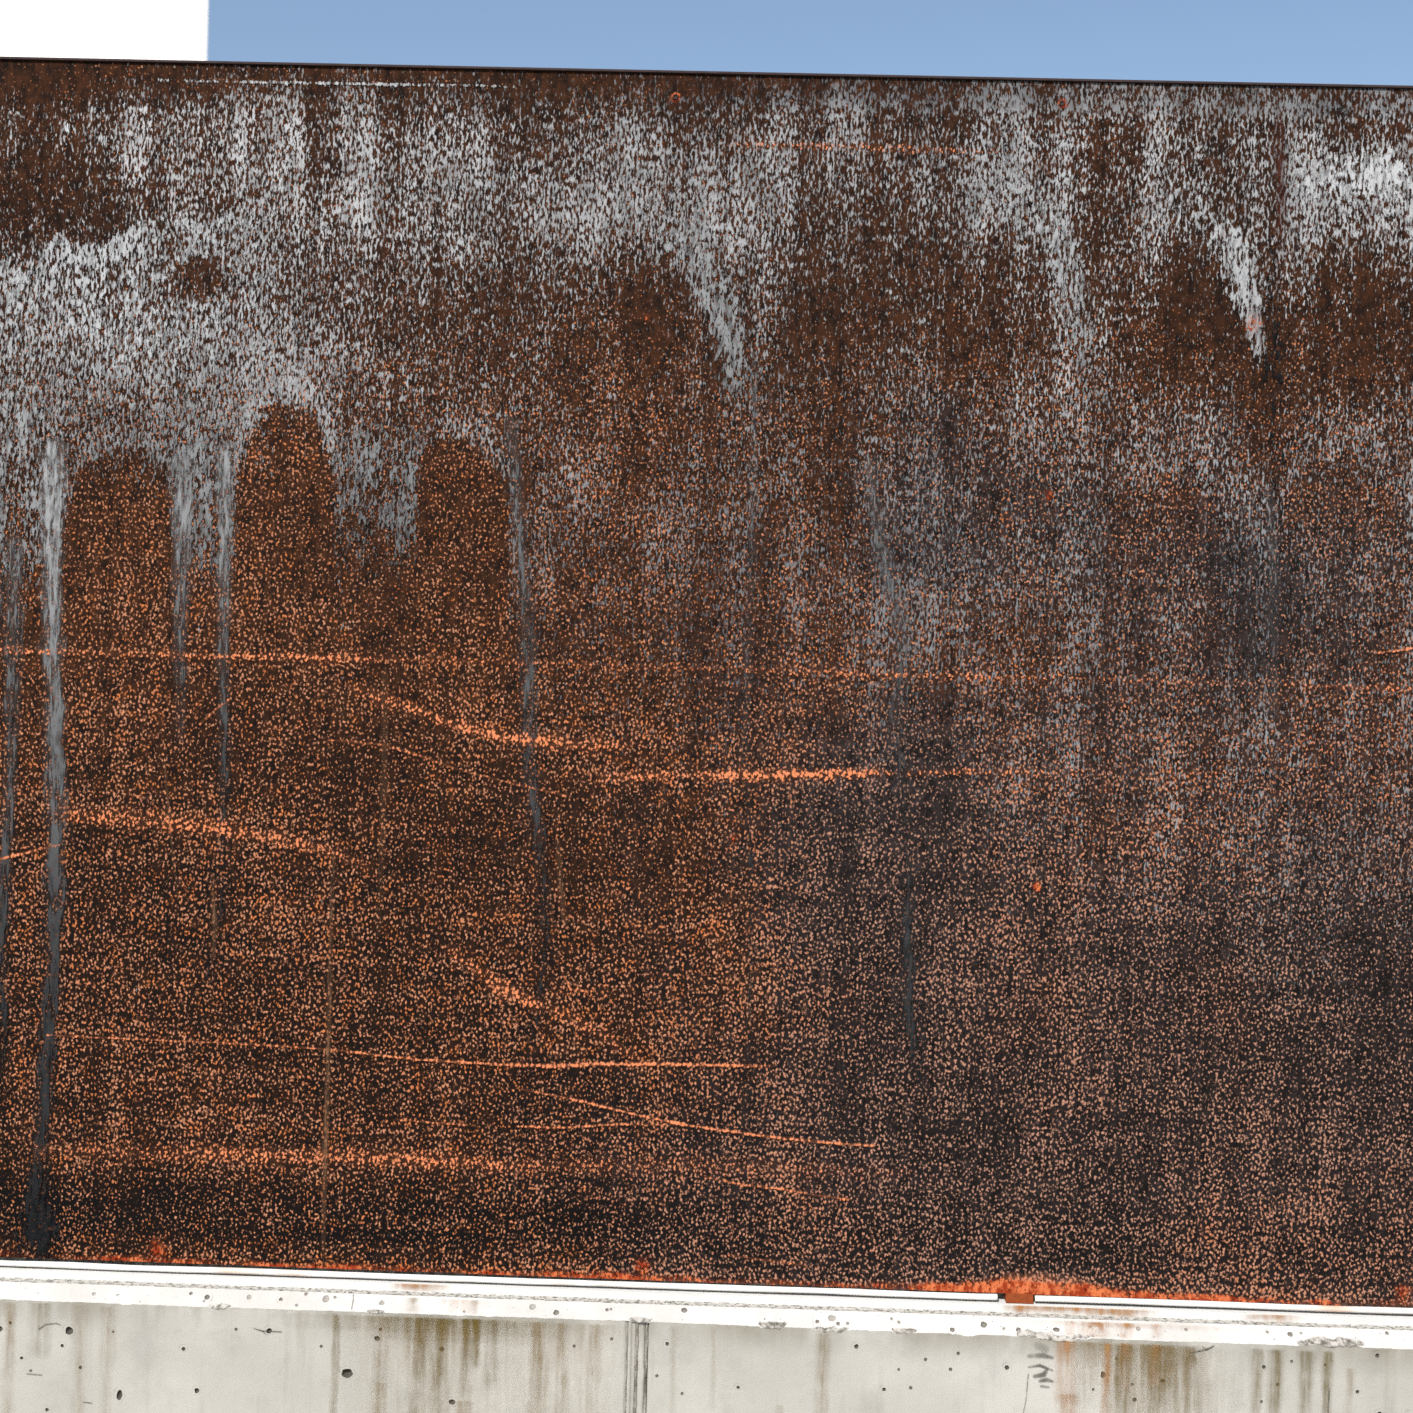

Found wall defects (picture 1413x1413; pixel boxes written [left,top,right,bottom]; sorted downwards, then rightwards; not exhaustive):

water stain [609,170,756,416]
rust [0,646,592,666]
water stain [511,463,546,895]
rust [654,665,1054,682]
water stain [0,208,427,1261]
rust [354,683,641,755]
rust [606,765,1054,784]
rust [65,806,364,865]
rust [442,947,643,1060]
rust [36,1032,862,1180]
rust [462,1260,745,1283]
rust [767,1274,1355,1328]